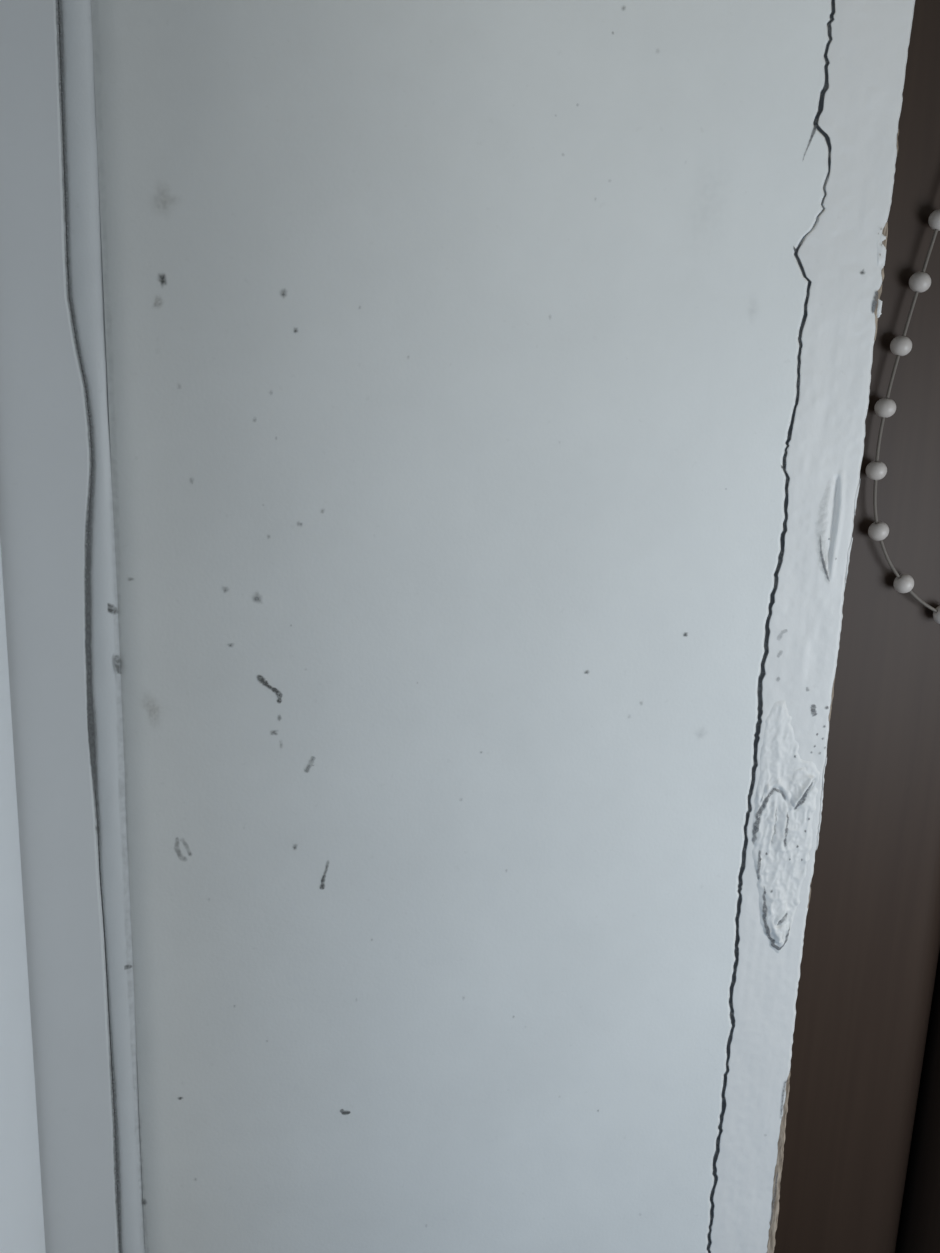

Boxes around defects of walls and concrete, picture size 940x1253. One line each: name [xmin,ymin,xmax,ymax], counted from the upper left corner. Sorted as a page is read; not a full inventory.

crack [808,0,835,213]
crack [707,242,811,1253]
flaking render [752,676,836,954]